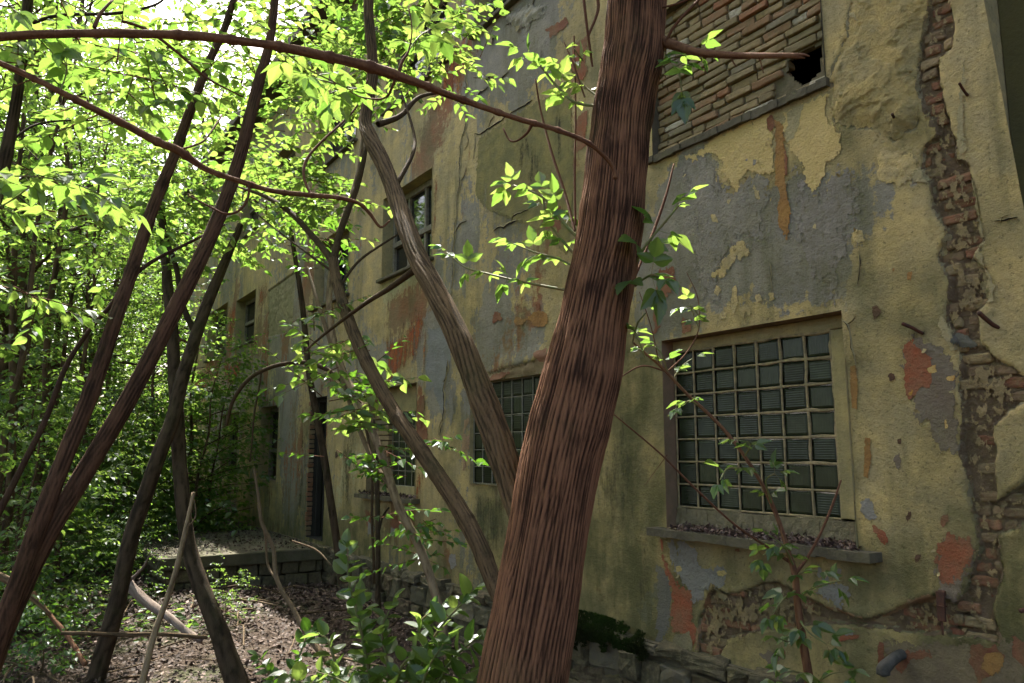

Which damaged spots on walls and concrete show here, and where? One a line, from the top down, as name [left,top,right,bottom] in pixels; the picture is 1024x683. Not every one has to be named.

peeling [504,3,569,38]
peeling [571,35,588,83]
rust [767,115,791,240]
rust [383,316,425,387]
flaking render [655,0,1024,683]